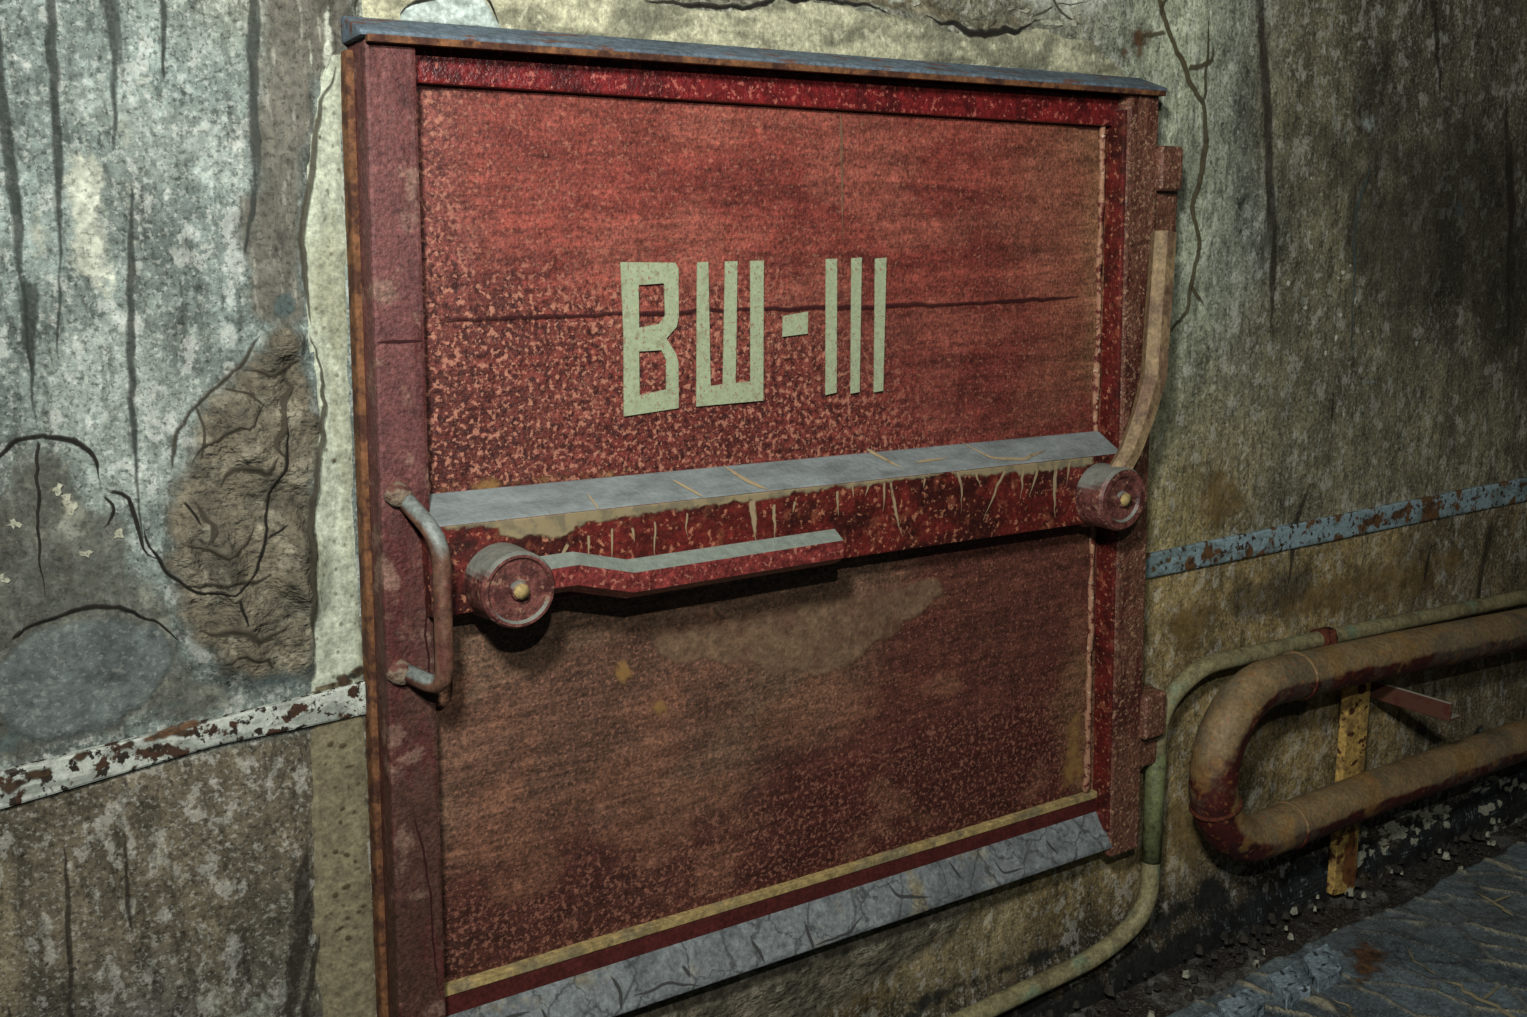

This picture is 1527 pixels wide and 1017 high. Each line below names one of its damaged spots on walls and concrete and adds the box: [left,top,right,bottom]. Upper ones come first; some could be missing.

peeling [400,0,499,28]
spalling [645,0,1117,38]
crack [1139,0,1214,333]
peeling [49,483,78,516]
crack [0,336,289,641]
spalling [314,665,364,695]
spalling [329,849,366,949]